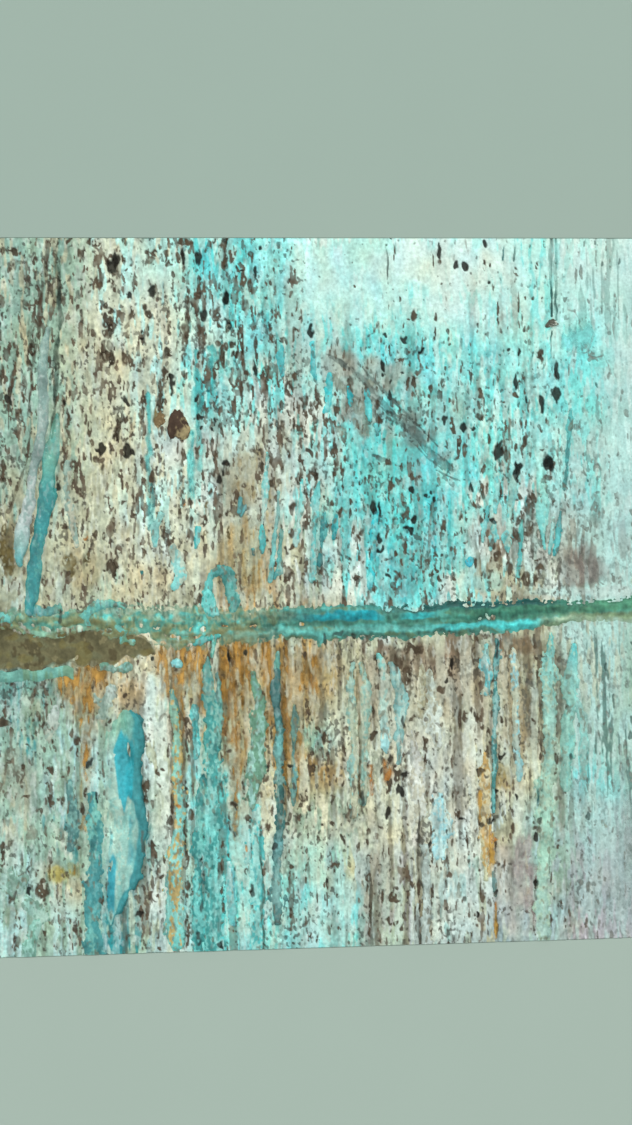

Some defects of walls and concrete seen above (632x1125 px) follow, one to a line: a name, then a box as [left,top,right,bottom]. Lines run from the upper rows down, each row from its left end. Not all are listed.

rust [157,644,204,736]
rust [58,665,107,781]
rust [221,641,317,832]
peeling [308,732,326,776]
rust [369,761,392,795]
peeling [0,825,37,867]
peeling [80,710,149,926]
peeling [220,782,263,837]
rust [478,790,495,873]
peeling [9,878,50,903]
peeling [58,909,82,939]
peeling [389,880,434,921]